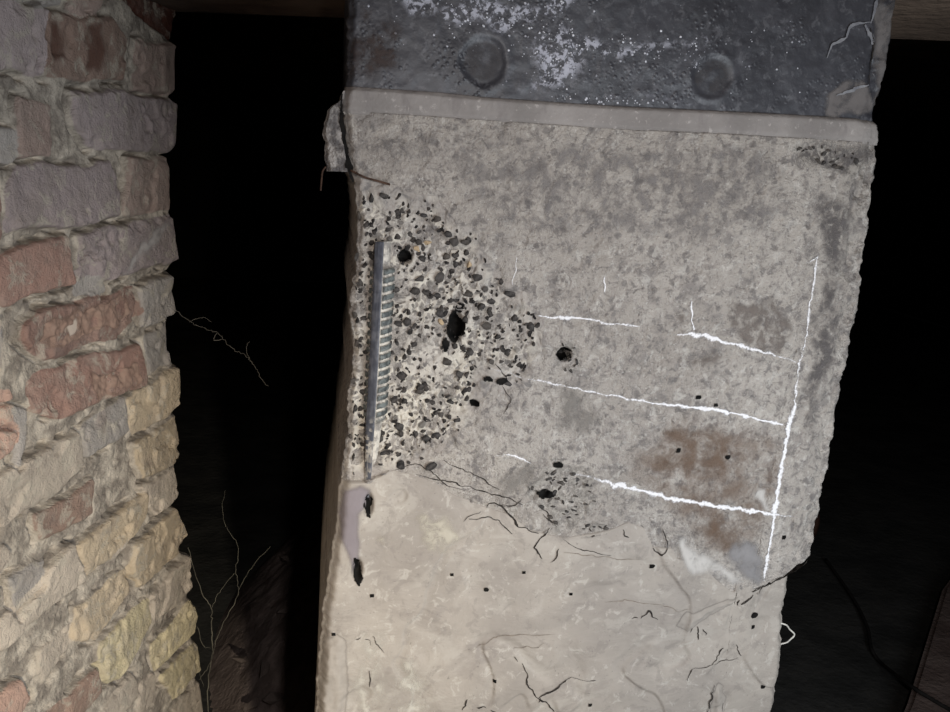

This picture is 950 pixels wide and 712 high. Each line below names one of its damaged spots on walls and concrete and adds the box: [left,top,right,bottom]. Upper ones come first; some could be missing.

water stain [395,0,682,100]
spalling [320,91,544,518]
crack [396,460,668,563]
crack [737,561,807,605]
crack [474,634,596,712]
crack [616,599,741,681]